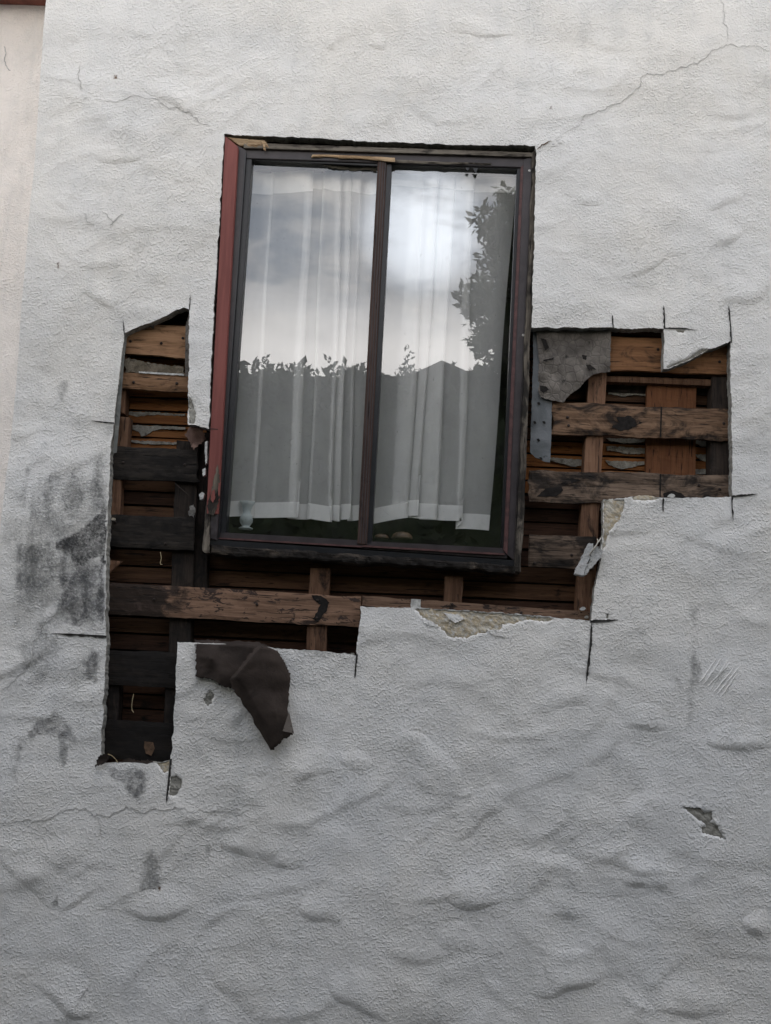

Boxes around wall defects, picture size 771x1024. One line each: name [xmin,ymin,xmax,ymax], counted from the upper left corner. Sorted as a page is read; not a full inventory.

crack [539,1,767,148]
spalling [188,399,196,424]
spalling [602,495,657,549]
spalling [416,609,552,639]
spalling [683,805,723,839]